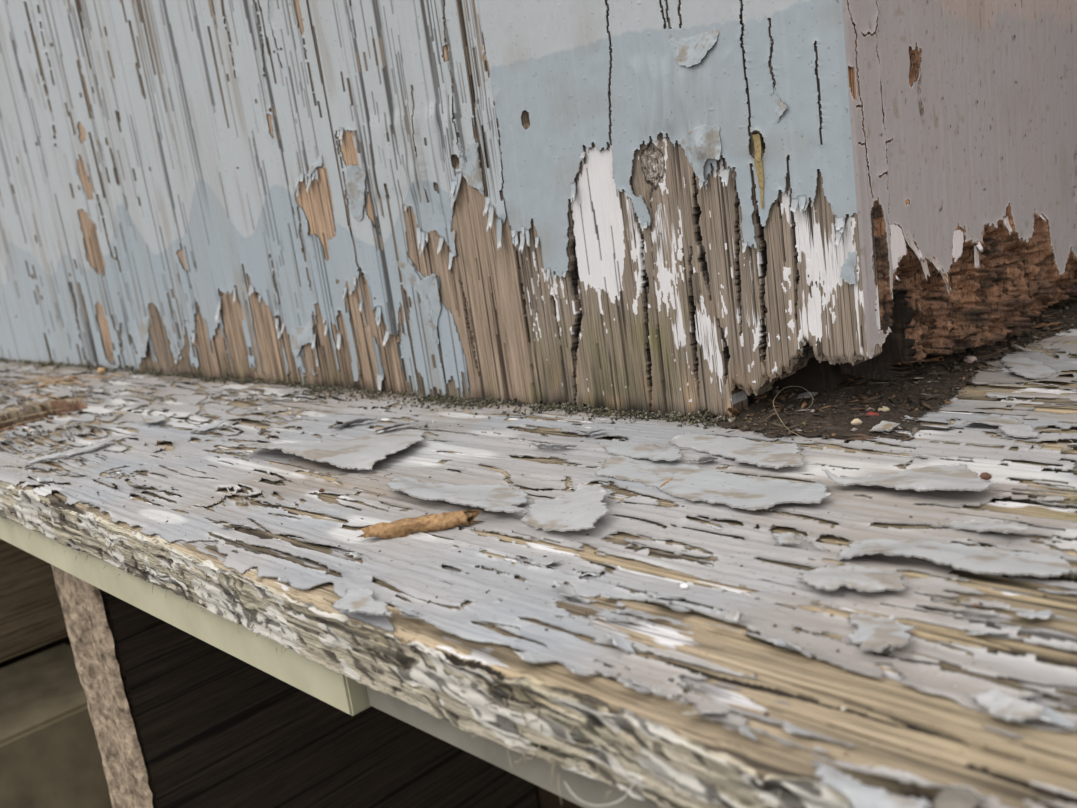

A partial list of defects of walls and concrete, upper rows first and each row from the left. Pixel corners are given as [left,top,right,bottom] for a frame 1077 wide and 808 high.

crack [847,0,892,231]
peeling [136,125,882,418]
spalling [890,203,1077,364]
peeling [0,438,161,538]
peeling [190,420,227,432]
peeling [172,522,363,576]
peeling [243,569,304,603]
peeling [237,417,435,470]
peeling [386,429,998,532]
peeling [931,483,1077,534]
peeling [933,382,1077,473]
peeling [332,532,1077,808]